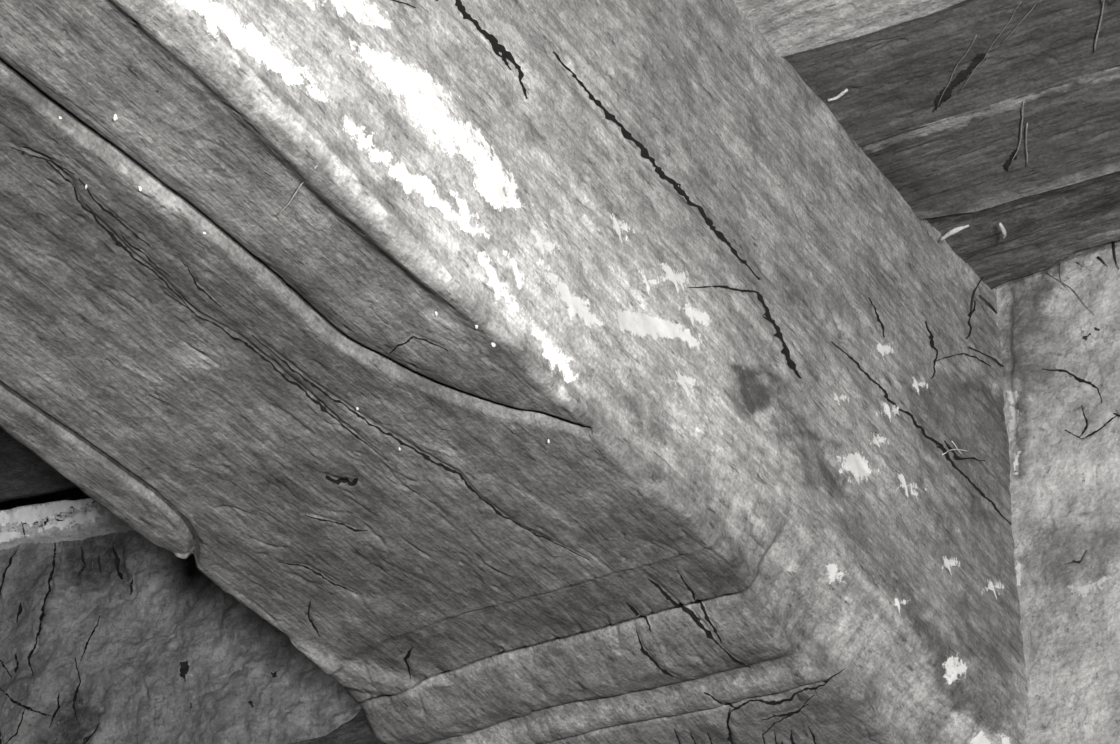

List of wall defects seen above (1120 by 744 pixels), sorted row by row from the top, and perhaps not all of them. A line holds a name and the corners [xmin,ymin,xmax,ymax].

crack [391,0,528,99]
crack [553,52,802,378]
crack [11,147,589,560]
crack [868,297,885,337]
crack [831,341,1012,525]
crack [925,301,991,379]
crack [1042,368,1120,439]
crack [0,501,133,744]
crack [626,570,751,679]
crack [674,669,844,744]